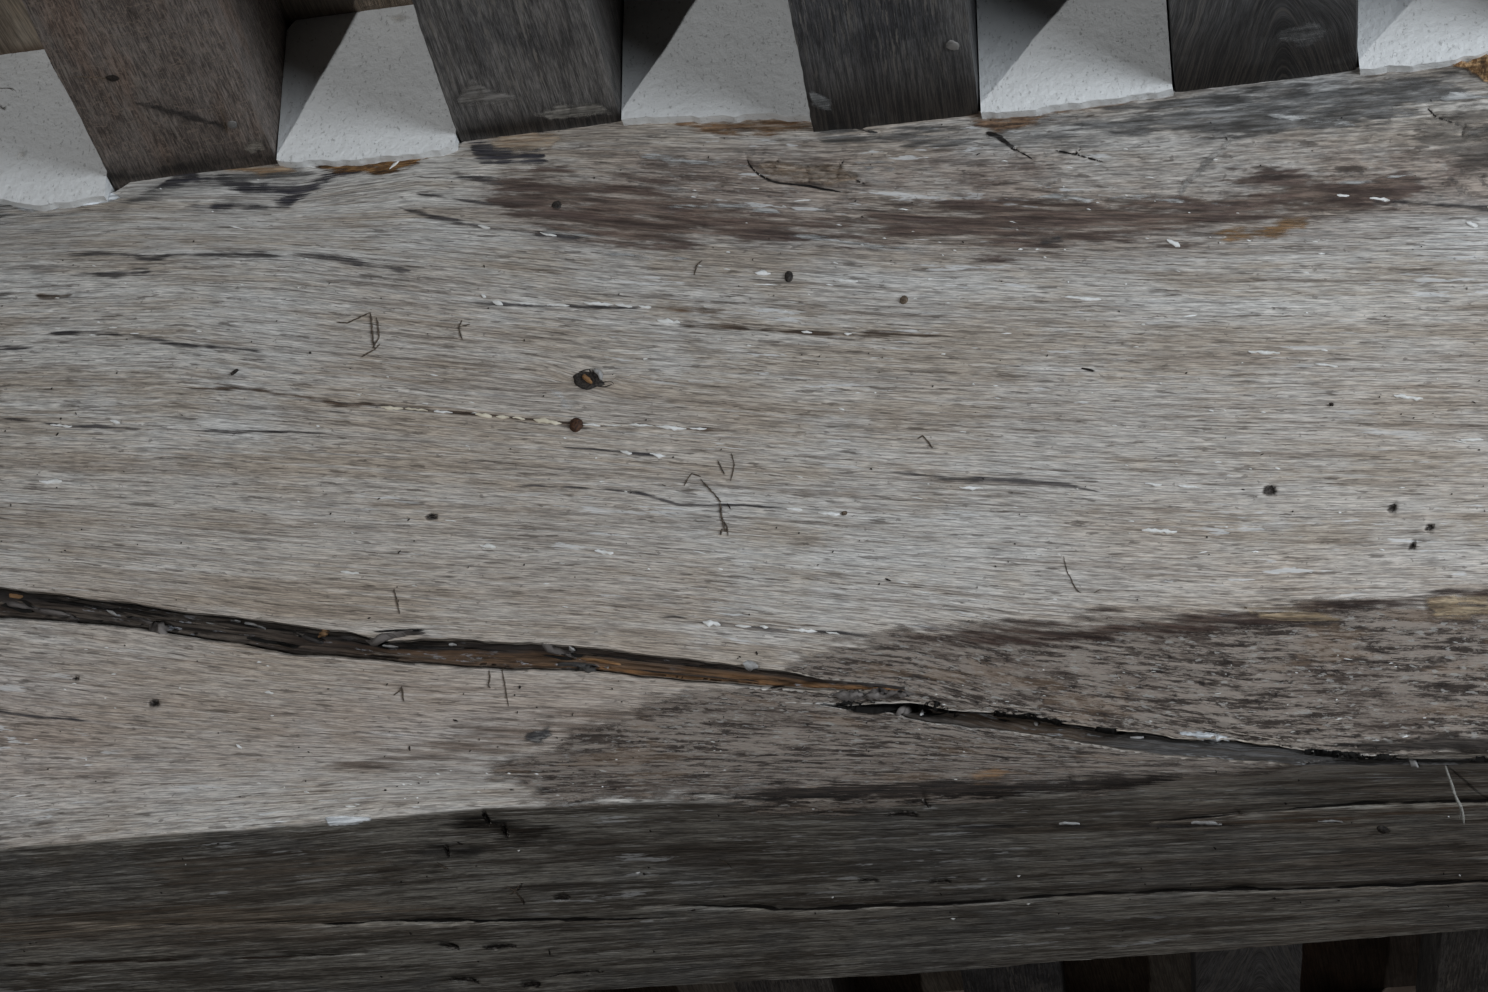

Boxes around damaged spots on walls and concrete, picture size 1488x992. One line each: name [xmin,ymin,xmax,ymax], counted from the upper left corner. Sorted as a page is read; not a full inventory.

water stain [676,71,1466,147]
water stain [487,133,1426,262]
crack [896,472,1098,492]
crack [1145,482,1201,490]
water stain [922,589,1488,647]
crack [0,589,1488,829]
water stain [337,710,643,772]
water stain [1331,735,1488,757]
water stain [689,769,1180,803]